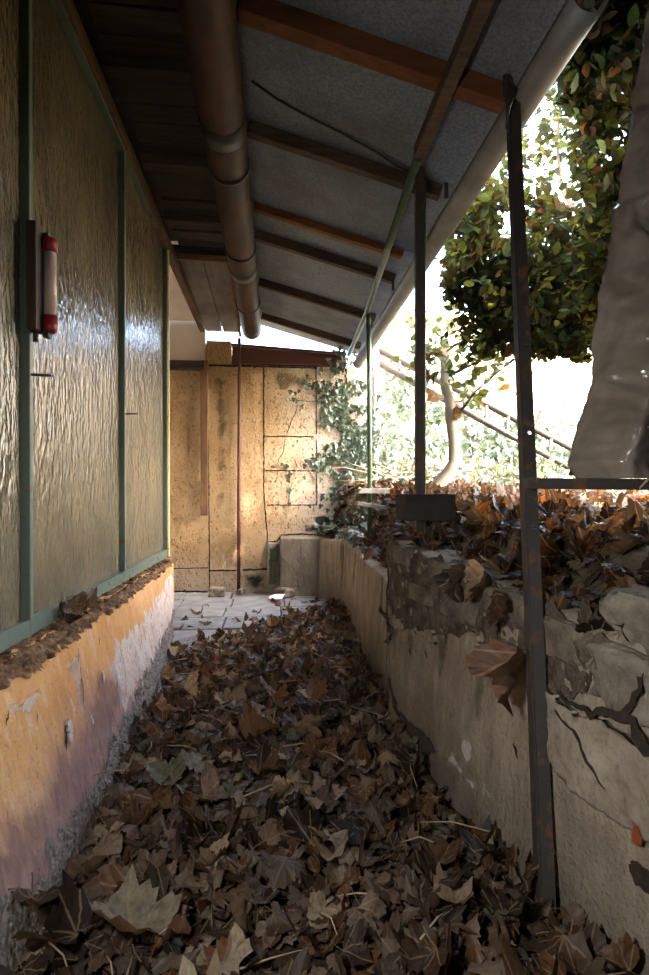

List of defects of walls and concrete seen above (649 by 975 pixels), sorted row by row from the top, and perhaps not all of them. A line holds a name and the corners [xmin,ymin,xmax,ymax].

flaking render [0,558,175,972]
flaking render [386,538,526,666]
flaking render [545,631,614,700]
crack [554,659,649,789]